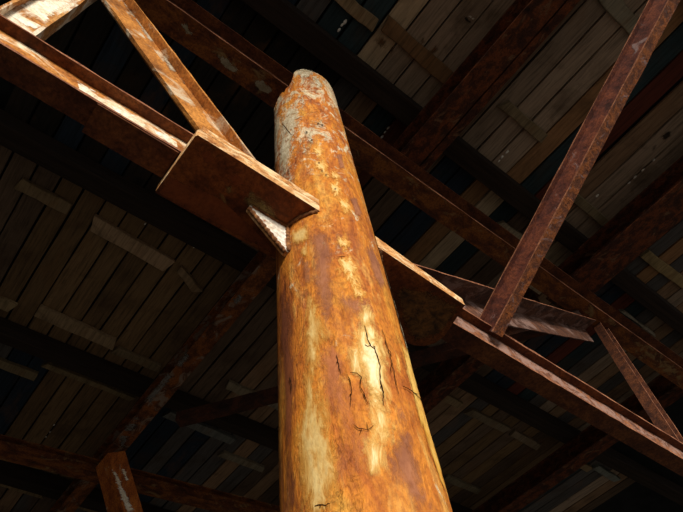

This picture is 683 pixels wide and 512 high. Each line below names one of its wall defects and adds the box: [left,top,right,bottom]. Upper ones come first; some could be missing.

peeling [298,69,323,88]
peeling [274,96,352,213]
rust [305,234,342,316]
rust [280,288,297,509]
crack [336,325,422,406]
rust [390,433,425,500]